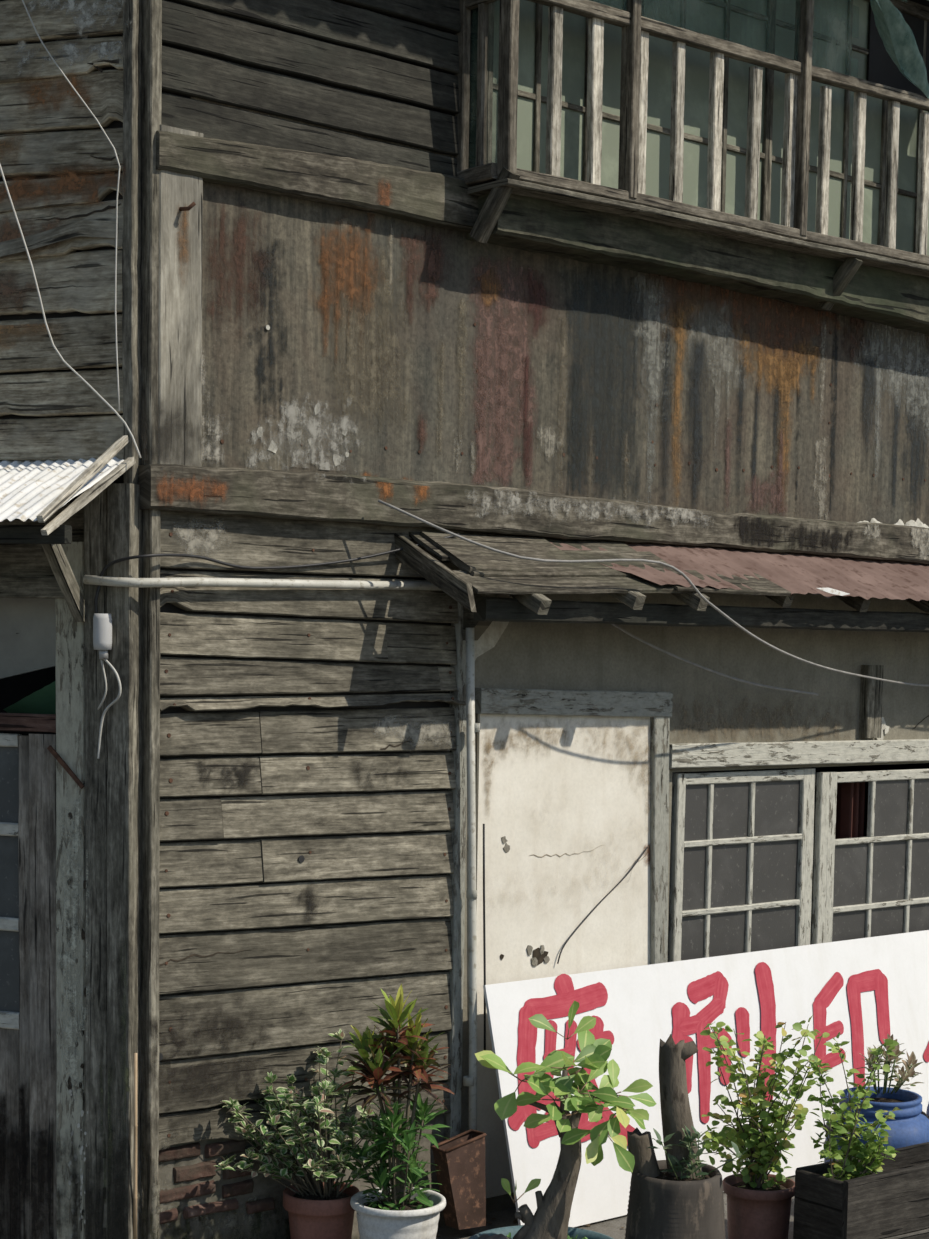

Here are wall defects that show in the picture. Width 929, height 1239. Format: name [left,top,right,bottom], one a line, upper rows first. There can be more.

rust [158,478,226,503]
peeling [249,397,359,476]
water stain [559,264,672,497]
rust [662,304,703,483]
water stain [688,308,852,551]
rust [736,324,819,501]
water stain [0,1085,152,1239]